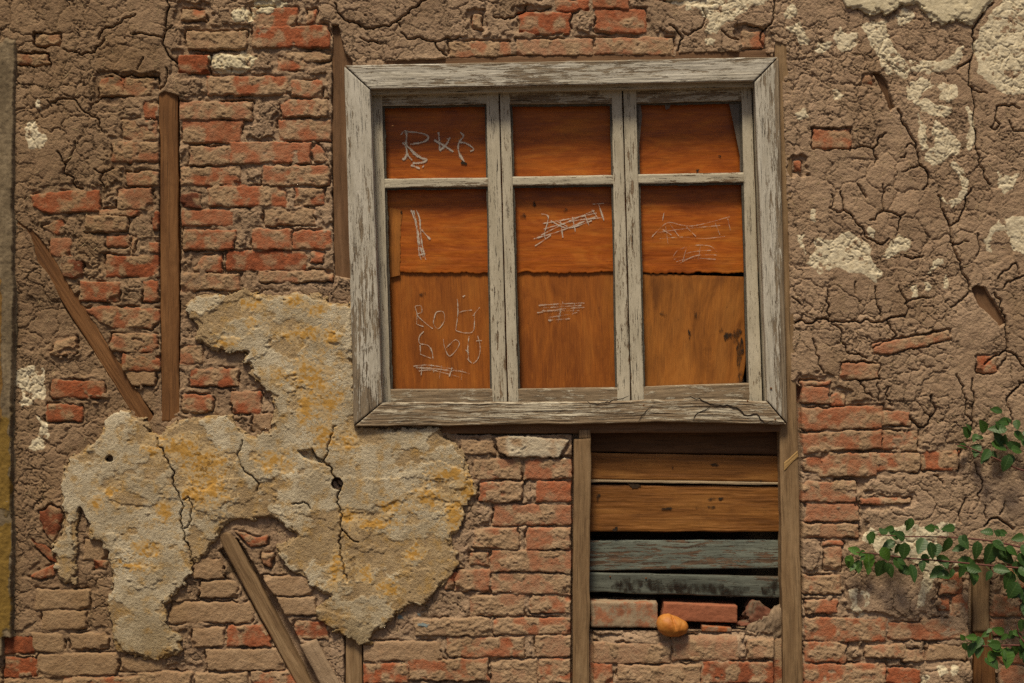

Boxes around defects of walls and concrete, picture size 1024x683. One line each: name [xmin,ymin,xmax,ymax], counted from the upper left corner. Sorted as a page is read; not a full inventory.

crack [55,0,179,130]
spalling [443,0,770,58]
crack [59,142,114,189]
crack [830,5,1016,306]
flaking render [0,0,575,683]
crack [795,285,923,373]
crack [862,385,936,428]
crack [958,263,1024,427]
crack [158,444,193,560]
crack [313,427,358,576]
spalling [796,328,973,683]
spalling [989,564,1024,683]